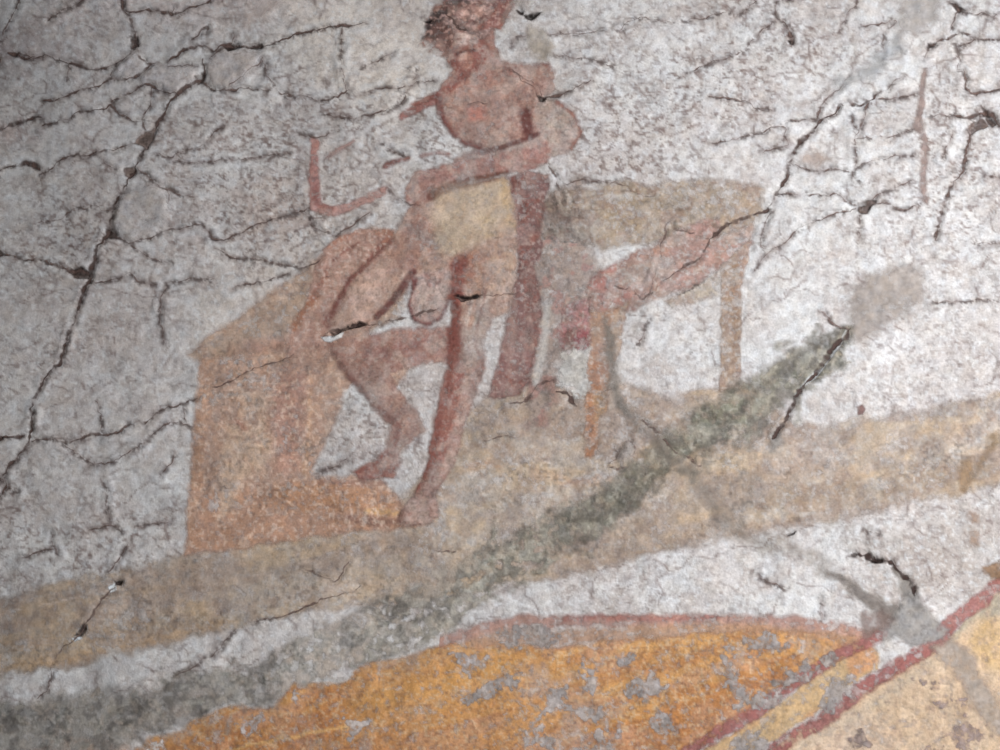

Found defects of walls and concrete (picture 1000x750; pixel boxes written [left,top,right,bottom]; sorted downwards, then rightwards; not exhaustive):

crack [924,7,1000,240]
crack [614,78,918,299]
crack [0,0,429,494]
crack [772,313,851,439]
crack [37,499,162,699]
crack [853,531,916,596]
peeling [460,672,523,706]
peeling [523,684,622,750]
peeling [623,670,669,702]
peeling [720,631,857,714]
peeling [848,728,872,748]
peeling [933,698,983,750]